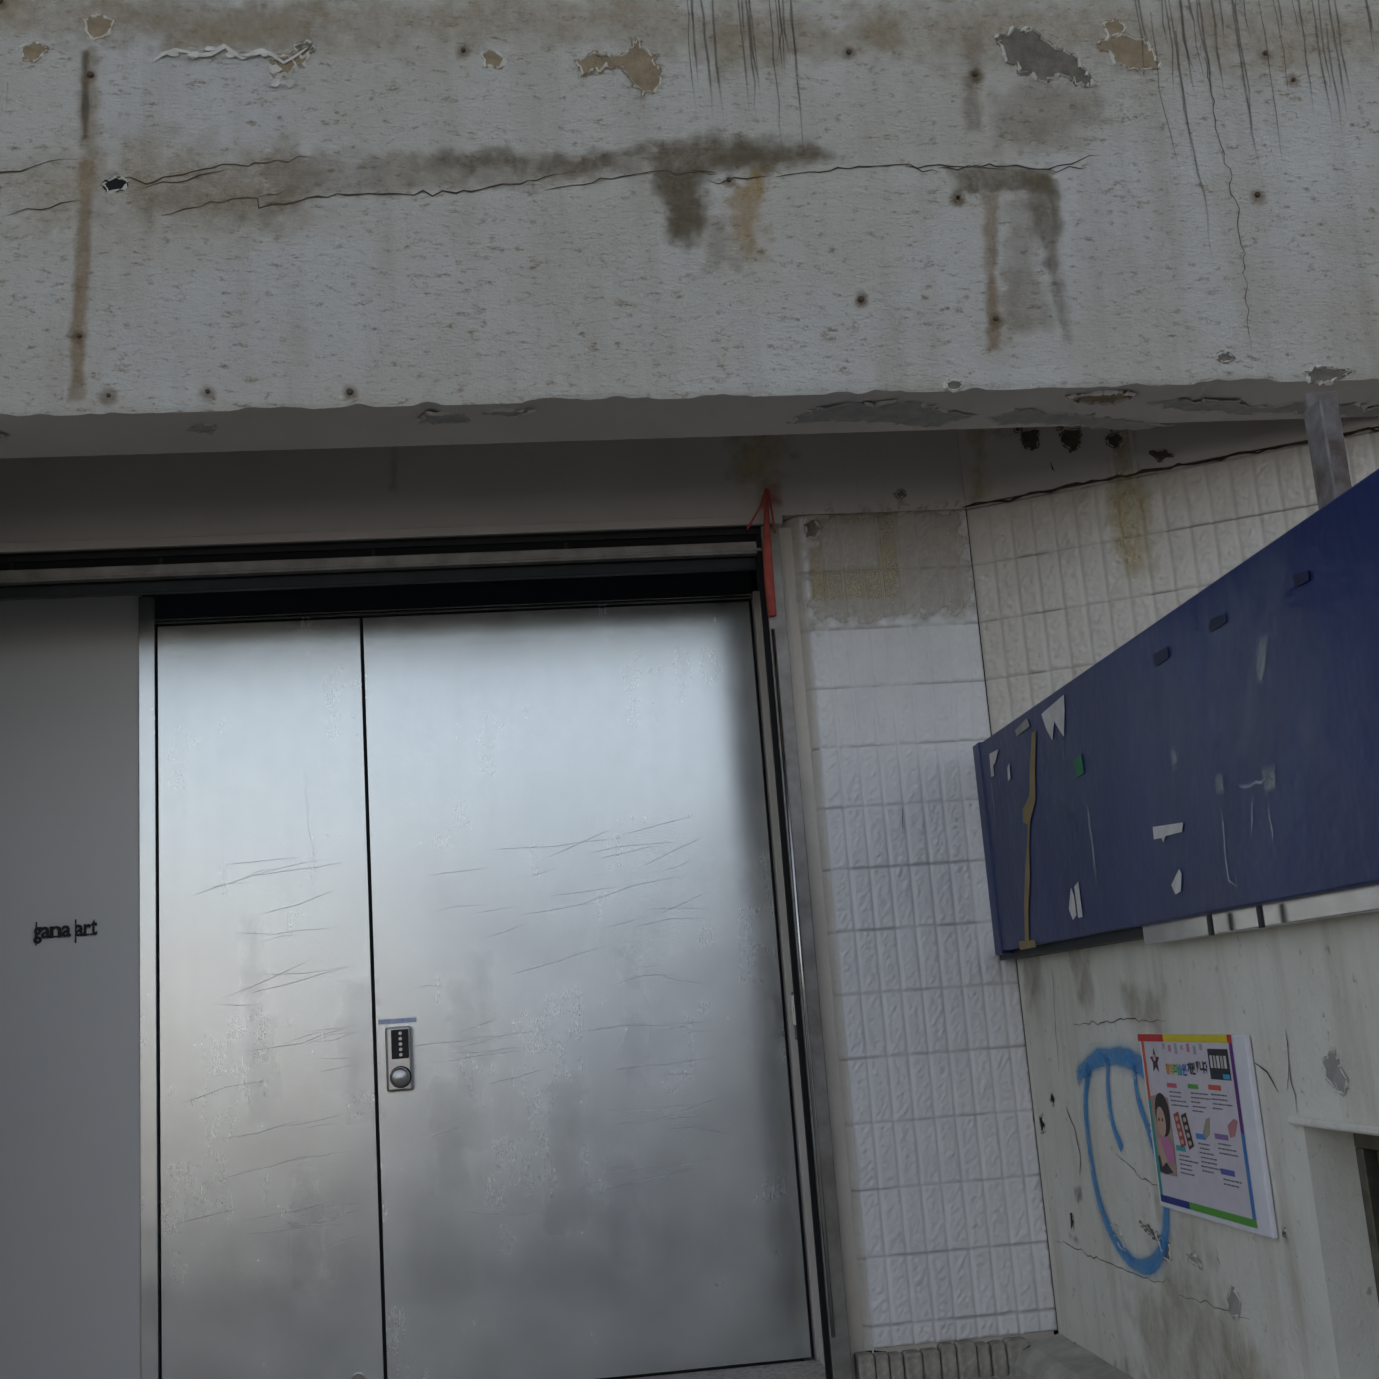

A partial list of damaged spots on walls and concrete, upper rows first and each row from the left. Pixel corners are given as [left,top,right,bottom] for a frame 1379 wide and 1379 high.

peeling [153,39,317,88]
peeling [574,37,663,97]
peeling [994,26,1098,89]
peeling [1096,17,1162,77]
crack [0,159,61,173]
crack [8,200,79,216]
crack [124,155,1096,216]
water stain [657,139,819,237]
peeling [943,378,965,393]
peeling [1214,350,1235,364]
peeling [1301,365,1353,386]
peeling [787,390,1306,453]